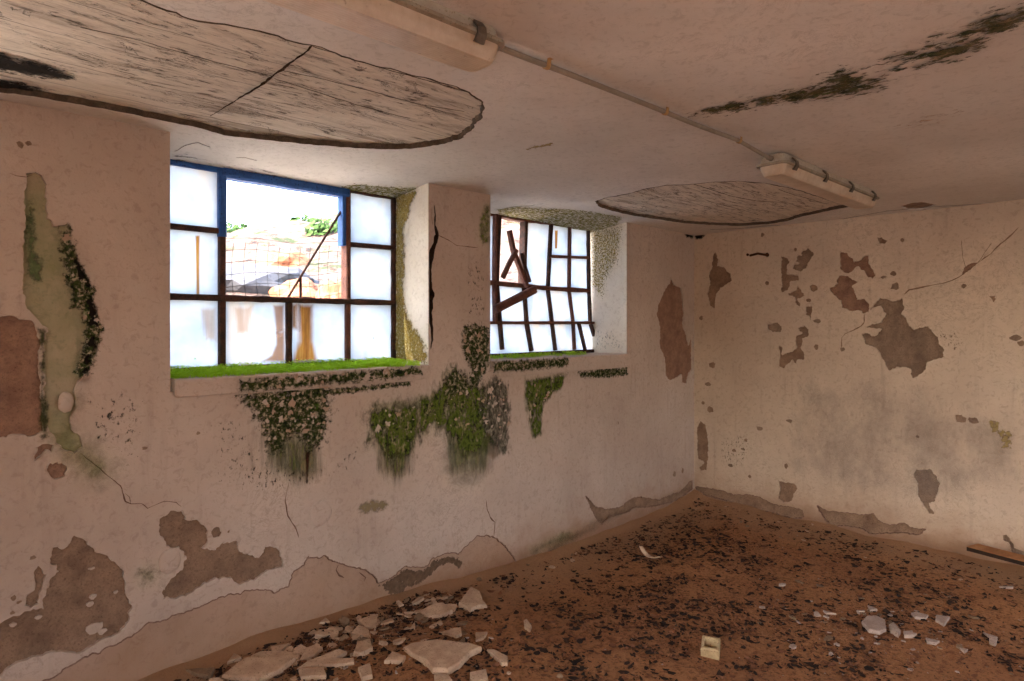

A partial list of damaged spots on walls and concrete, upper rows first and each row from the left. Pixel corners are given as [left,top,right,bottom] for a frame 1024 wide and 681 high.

crack [81,27,465,118]
flaking render [0,170,102,481]
crack [429,205,478,347]
flaking render [656,278,693,384]
flaking render [765,247,964,380]
crack [905,227,1019,294]
damp [479,377,512,455]
crack [80,453,180,509]
flaking render [585,463,805,525]
flaking render [817,505,926,535]
flaking render [0,509,516,681]